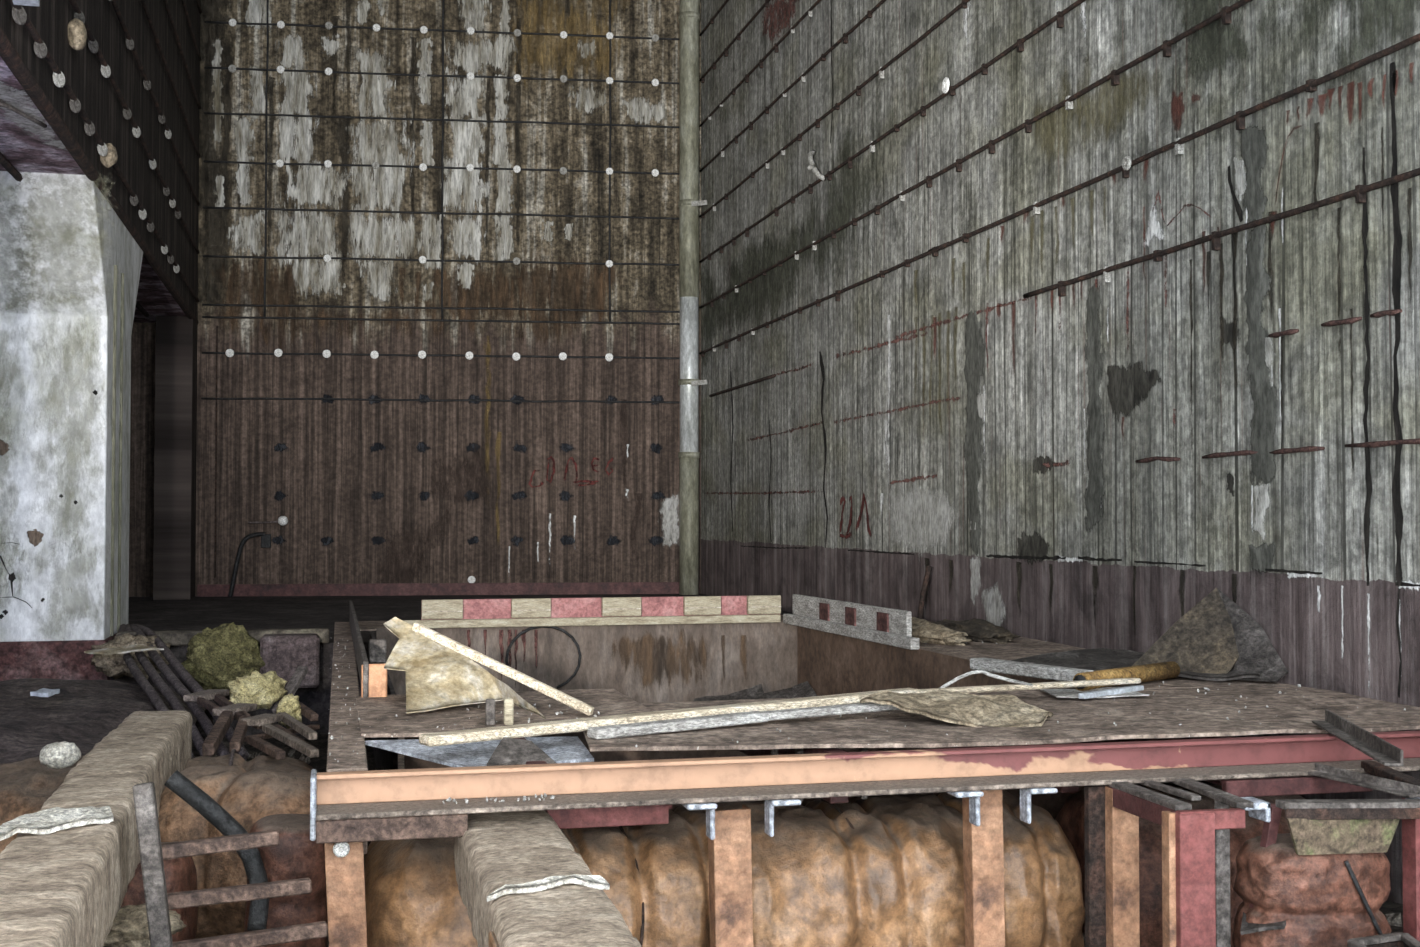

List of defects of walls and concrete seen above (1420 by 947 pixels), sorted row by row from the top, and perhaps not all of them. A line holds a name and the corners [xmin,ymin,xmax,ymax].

damp [198,0,243,304]
damp [267,77,275,248]
damp [331,0,352,275]
damp [408,37,417,220]
damp [512,0,621,246]
corrosion [1287,63,1414,123]
damp [1189,208,1248,459]
damp [1268,190,1283,449]
crack [1362,62,1420,698]
crack [986,554,1206,567]
crack [1265,568,1323,576]